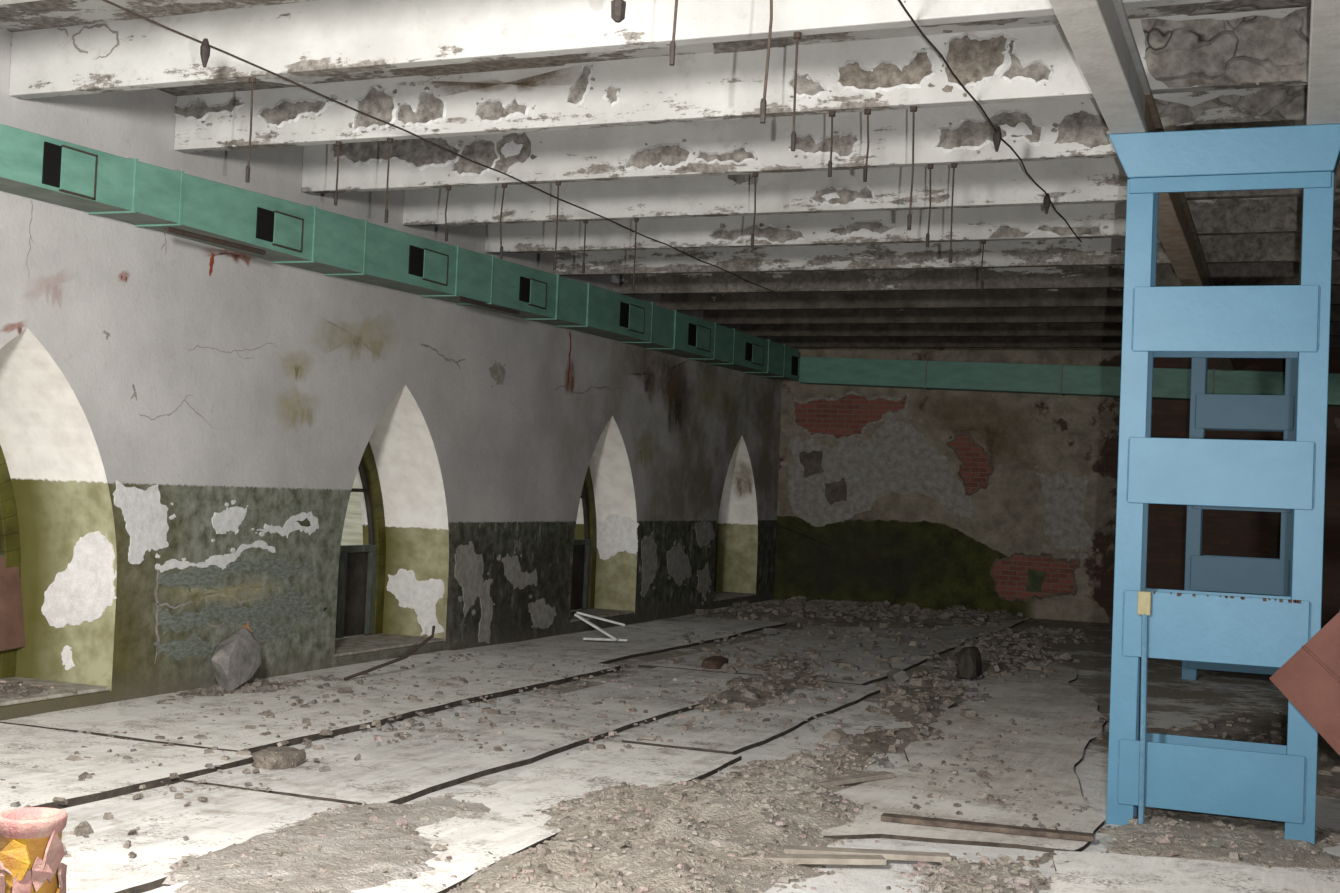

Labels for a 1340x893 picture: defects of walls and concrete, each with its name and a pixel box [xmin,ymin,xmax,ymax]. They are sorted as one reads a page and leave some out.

spalling [712,35,817,54]
spalling [788,17,1054,102]
peeling [1141,0,1311,129]
spalling [156,53,621,181]
spalling [618,139,758,186]
spalling [787,131,861,159]
spalling [708,184,897,244]
peeling [781,391,994,527]
peeling [41,480,319,628]
spalling [989,466,1099,602]
peeling [61,645,75,670]